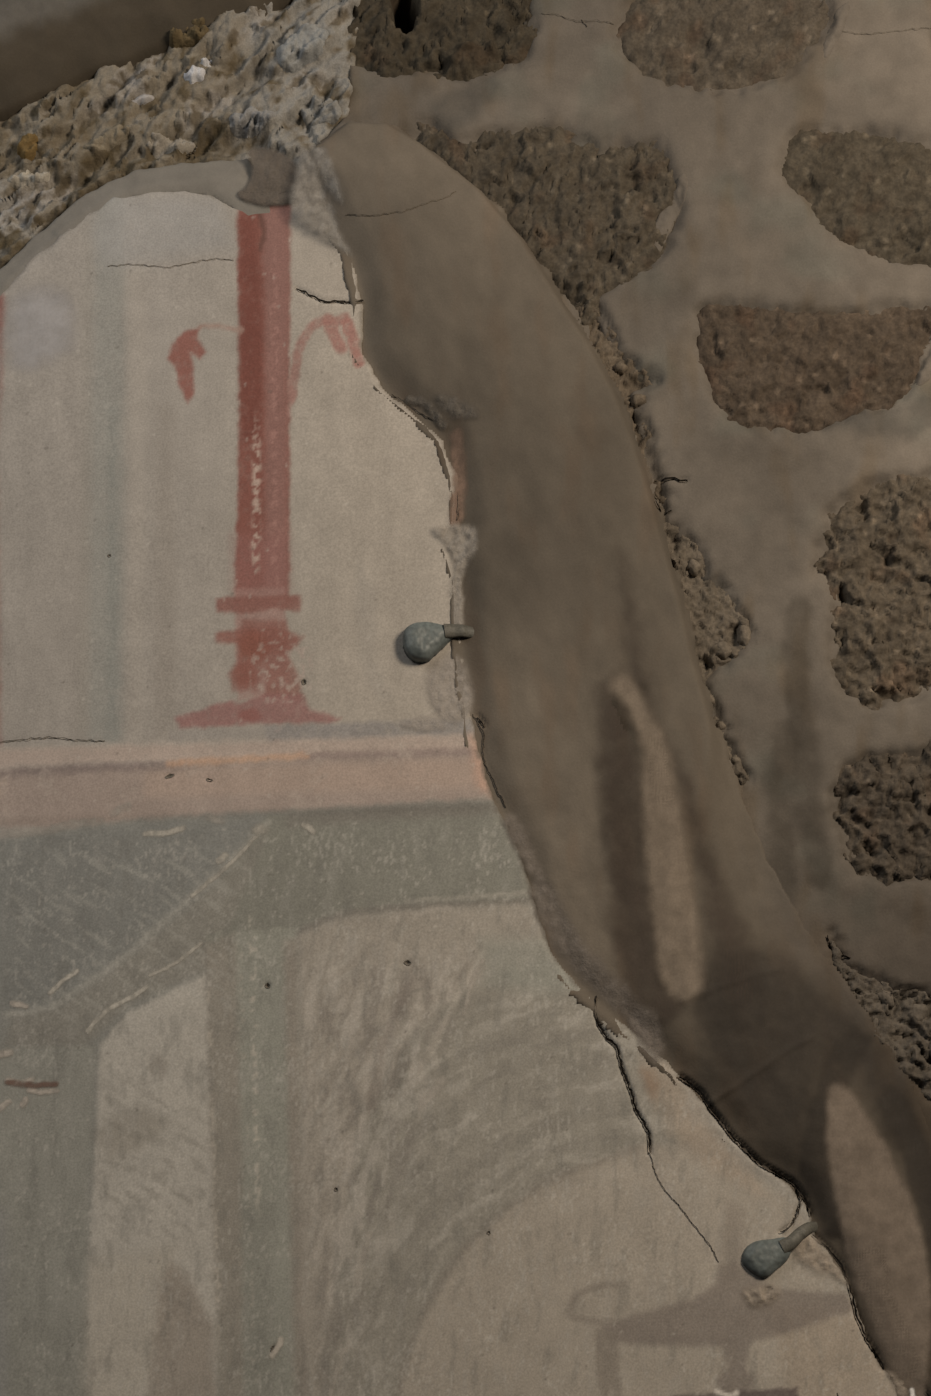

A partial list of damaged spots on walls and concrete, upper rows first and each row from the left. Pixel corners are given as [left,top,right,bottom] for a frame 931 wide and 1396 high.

spalling [0,0,361,269]
crack [108,258,234,268]
crack [296,288,363,304]
spalling [576,302,653,456]
flaking render [404,658,471,730]
flaking render [437,525,476,624]
spalling [653,480,751,785]
spalling [829,941,931,1100]
crack [595,996,719,1262]